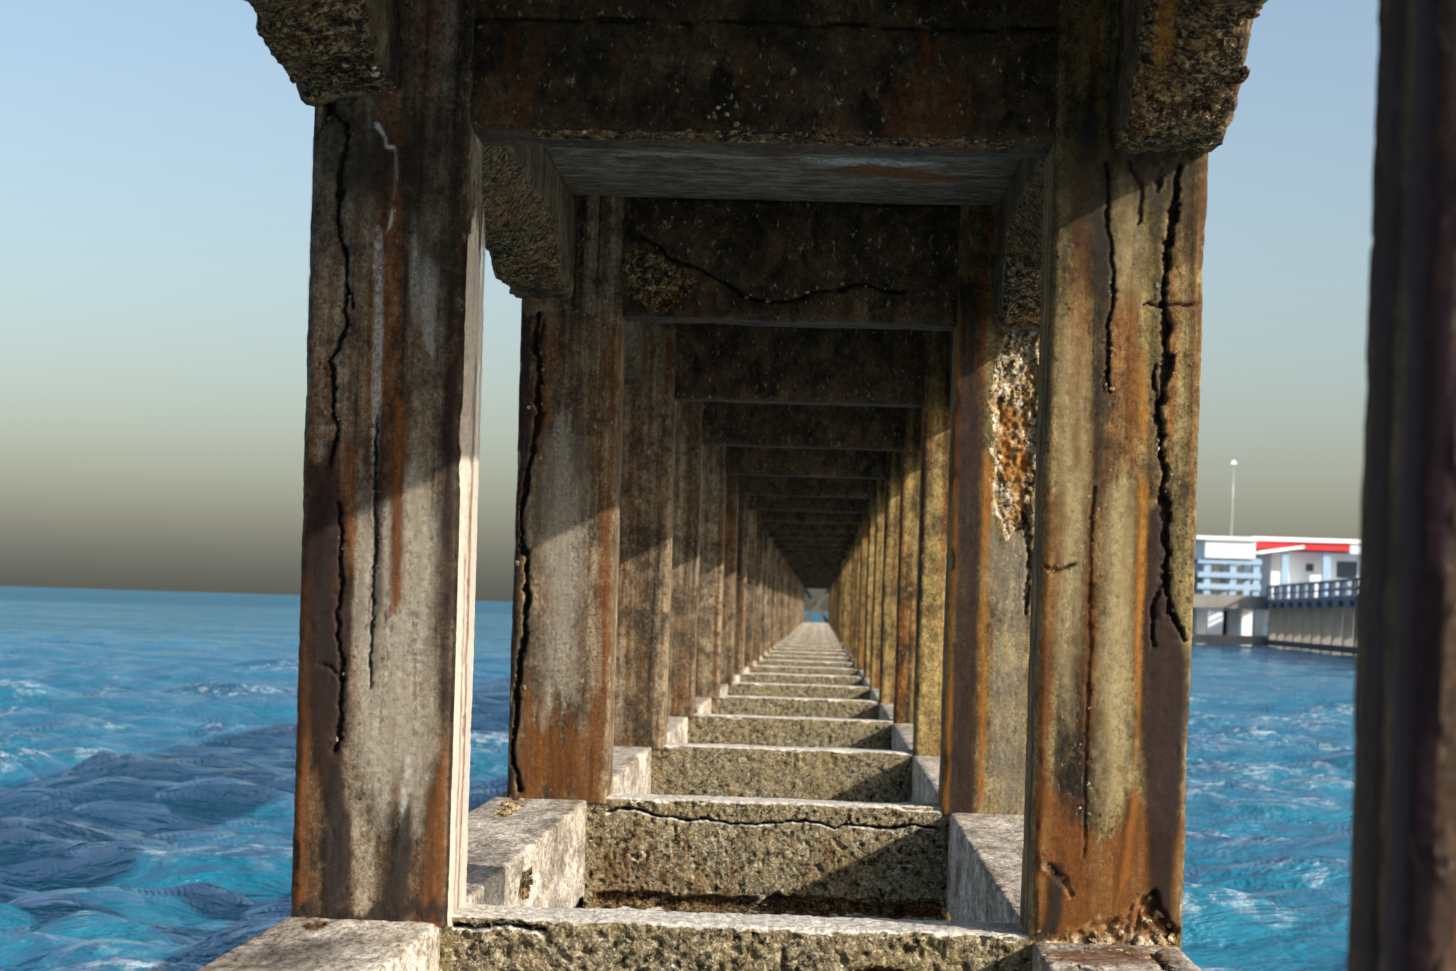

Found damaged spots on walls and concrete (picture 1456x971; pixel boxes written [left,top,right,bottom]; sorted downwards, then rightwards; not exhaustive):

spalling [244,0,397,138]
spalling [1114,0,1268,190]
corrosion [294,573,309,912]
crack [327,109,395,742]
corrosion [391,399,405,610]
corrosion [419,698,466,927]
crack [512,312,545,792]
corrosion [508,312,611,803]
crack [607,806,937,831]
spalling [988,159,1046,541]
corrosion [1033,477,1189,965]
crack [1104,162,1192,500]